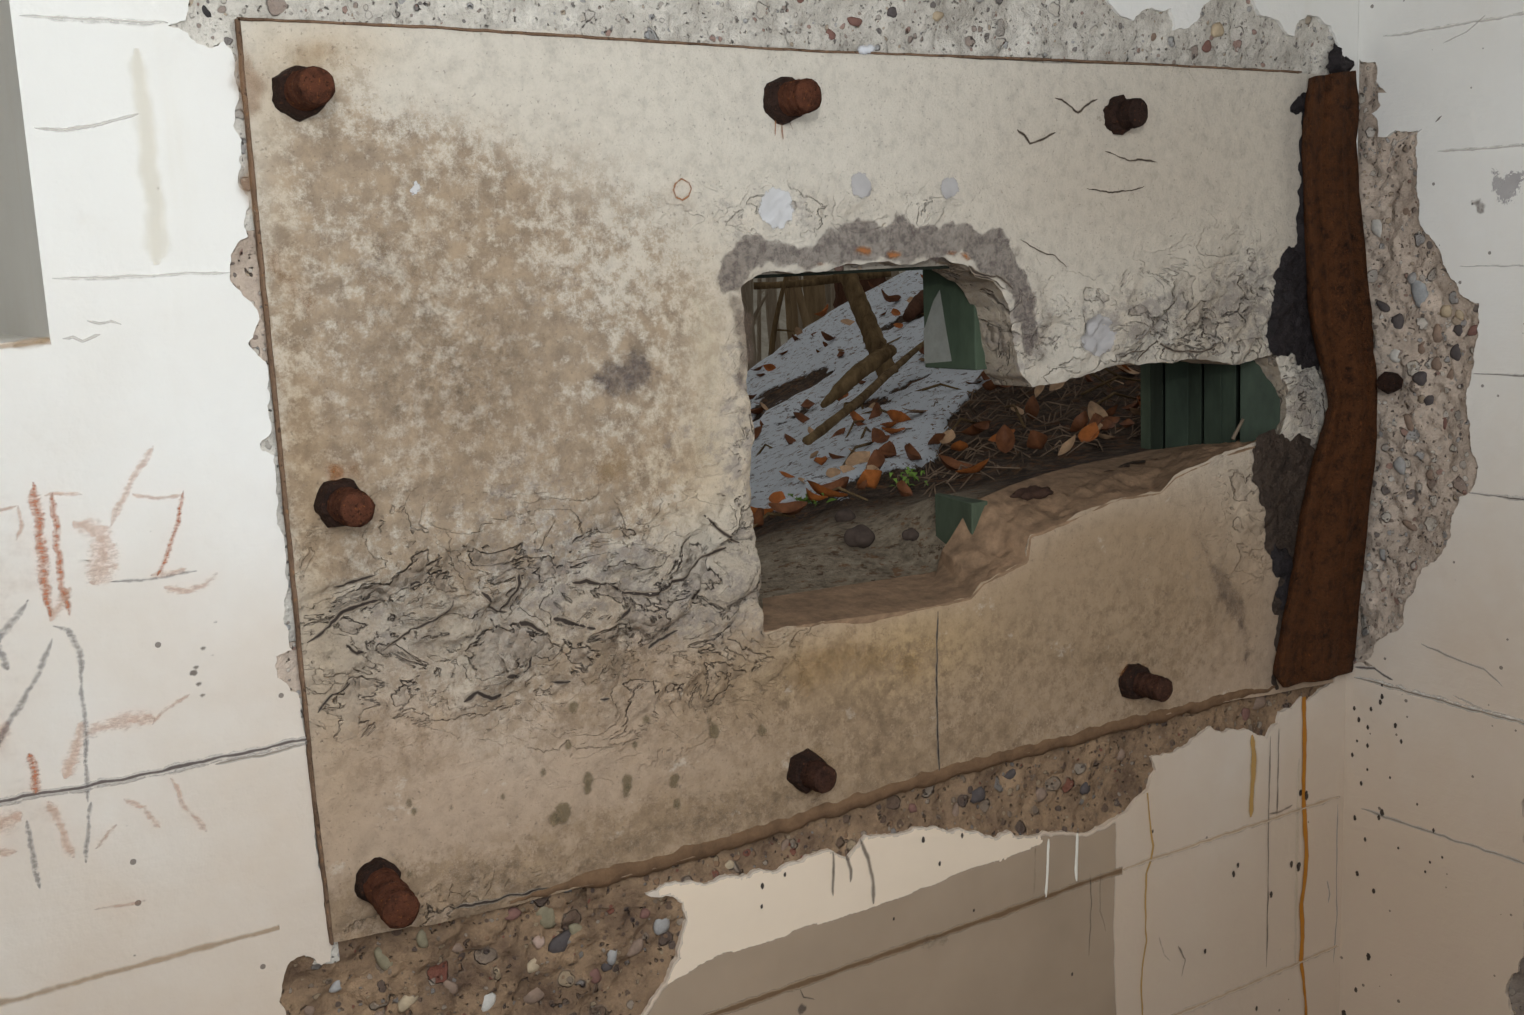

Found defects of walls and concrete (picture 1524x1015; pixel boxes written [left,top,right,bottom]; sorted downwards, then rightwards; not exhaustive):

spalling [169,0,1335,752]
spalling [1353,59,1479,667]
crack [0,515,740,805]
peeling [279,684,1325,1015]
corrosion [1299,697,1309,1015]
spalling [1509,958,1524,1015]